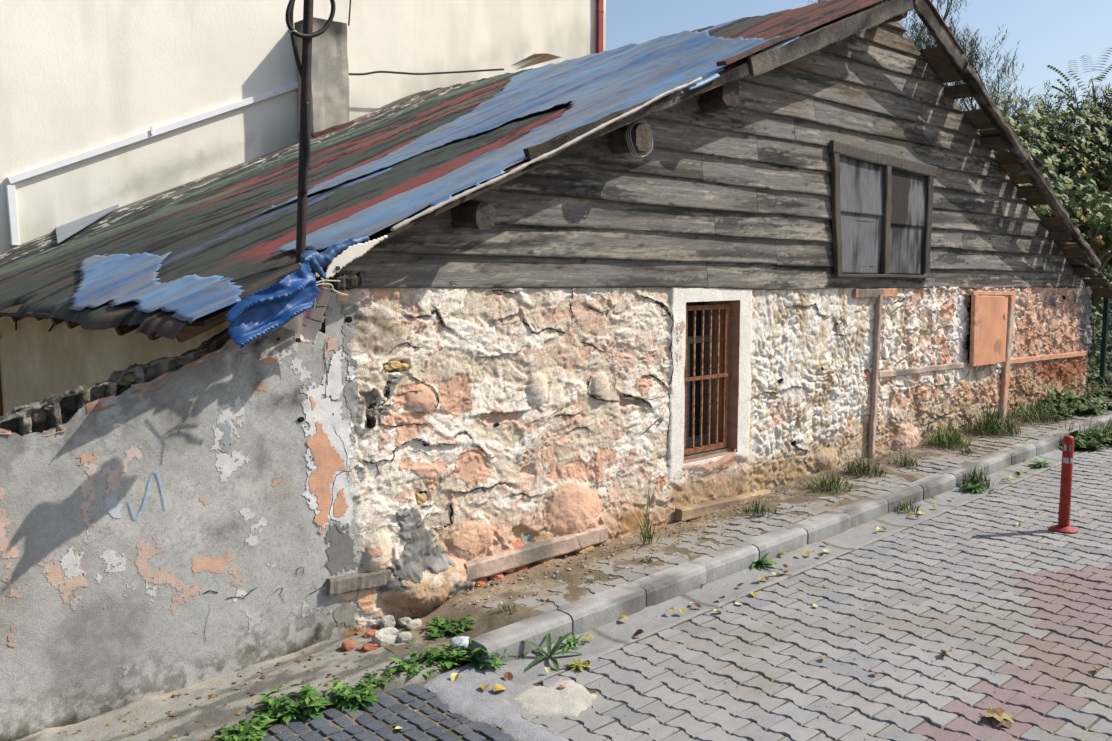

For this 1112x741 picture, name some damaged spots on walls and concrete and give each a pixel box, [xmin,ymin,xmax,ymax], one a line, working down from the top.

spalling [86,338,234,414]
peeling [209,387,250,483]
crack [329,306,534,534]
crack [482,288,674,463]
peeling [0,488,28,601]
peeling [32,444,267,633]